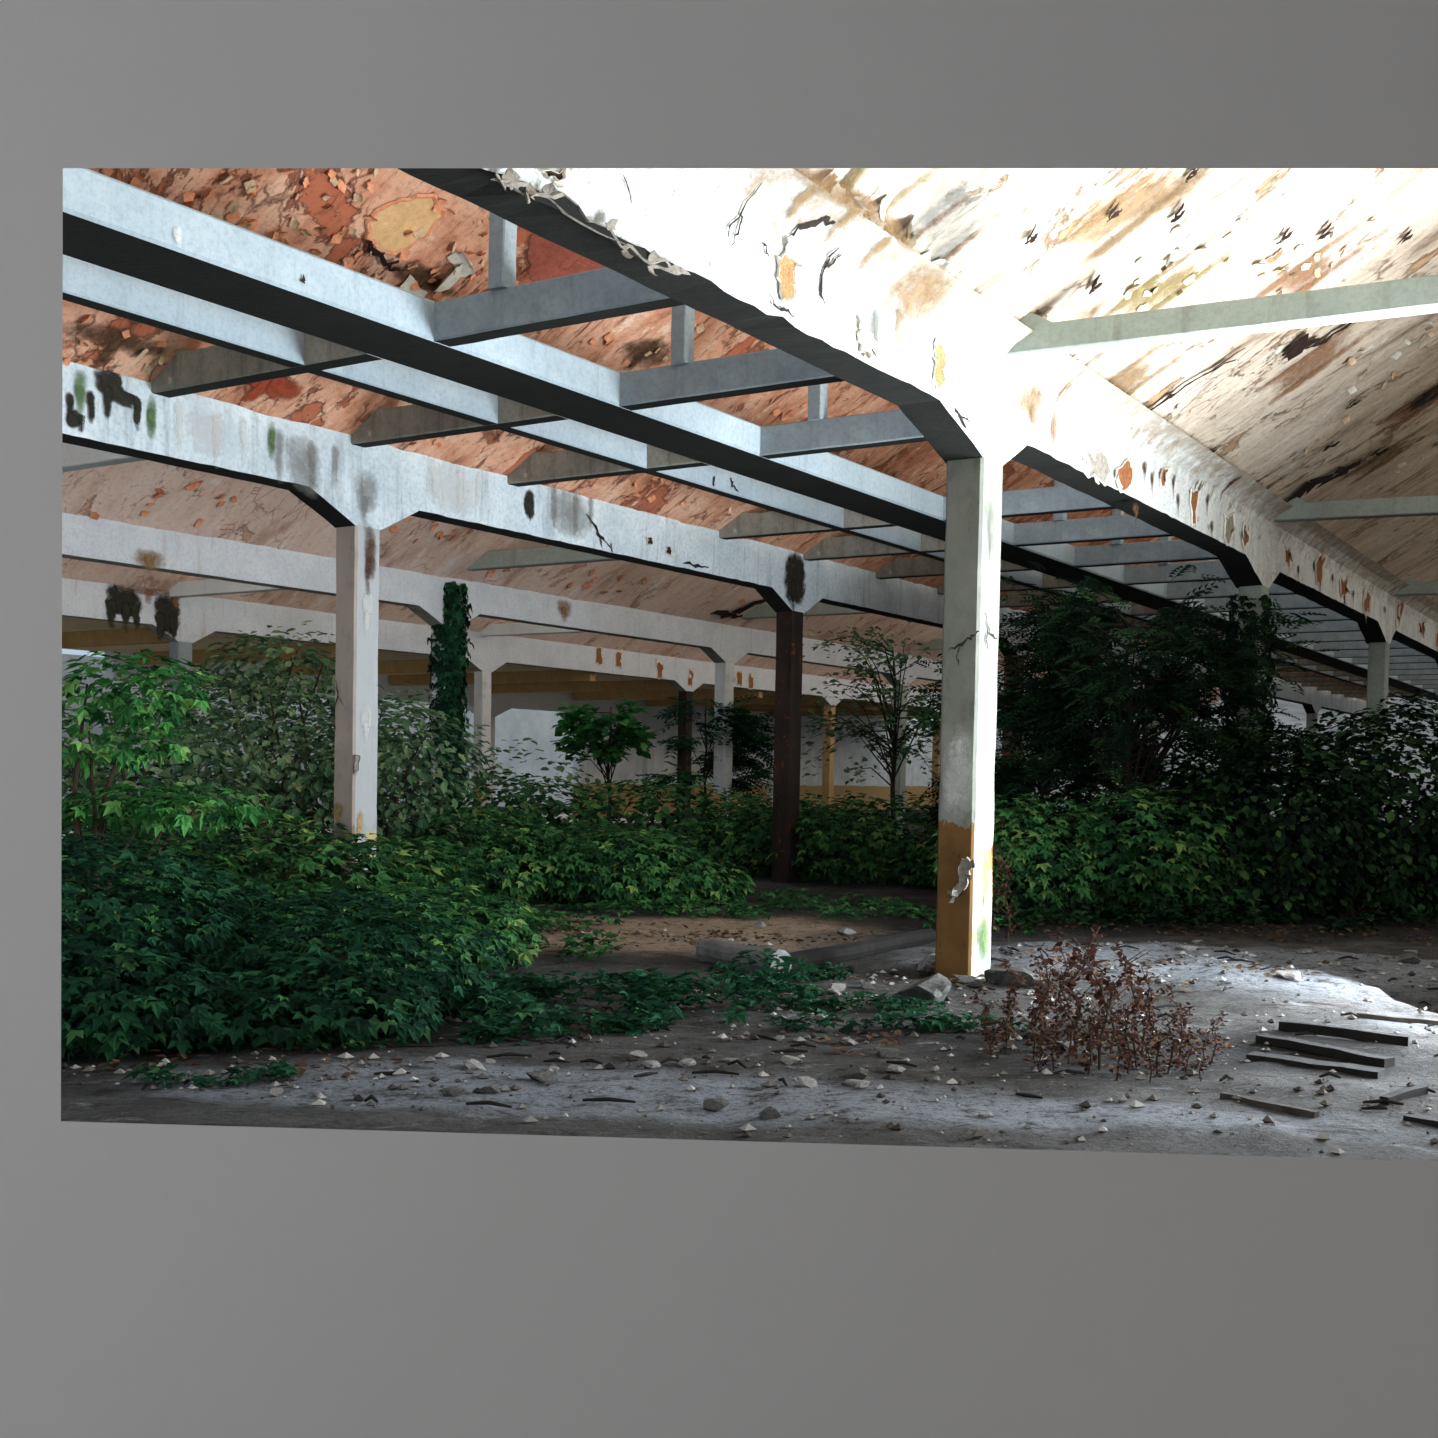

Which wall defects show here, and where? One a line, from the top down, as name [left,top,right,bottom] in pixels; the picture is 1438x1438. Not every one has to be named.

spalling [490,168,691,282]
crack [728,183,843,317]
damp [1067,168,1205,259]
damp [1107,194,1255,316]
damp [1258,235,1361,297]
damp [67,324,163,435]
damp [1109,348,1177,396]
damp [1266,324,1359,398]
rust [1206,476,1241,532]
damp [105,585,181,640]
damp [785,554,806,612]
spalling [947,849,991,911]